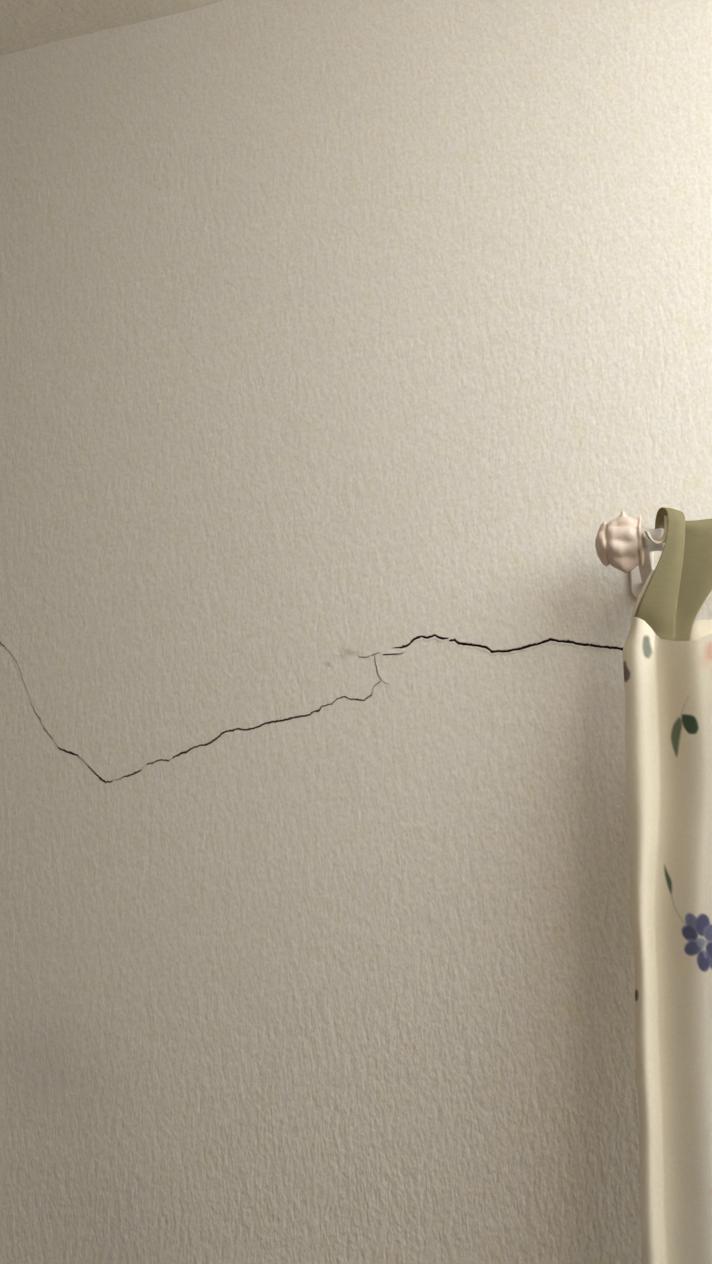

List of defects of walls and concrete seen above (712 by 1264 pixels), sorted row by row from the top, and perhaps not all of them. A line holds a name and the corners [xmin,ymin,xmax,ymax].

crack [35,634,623,784]